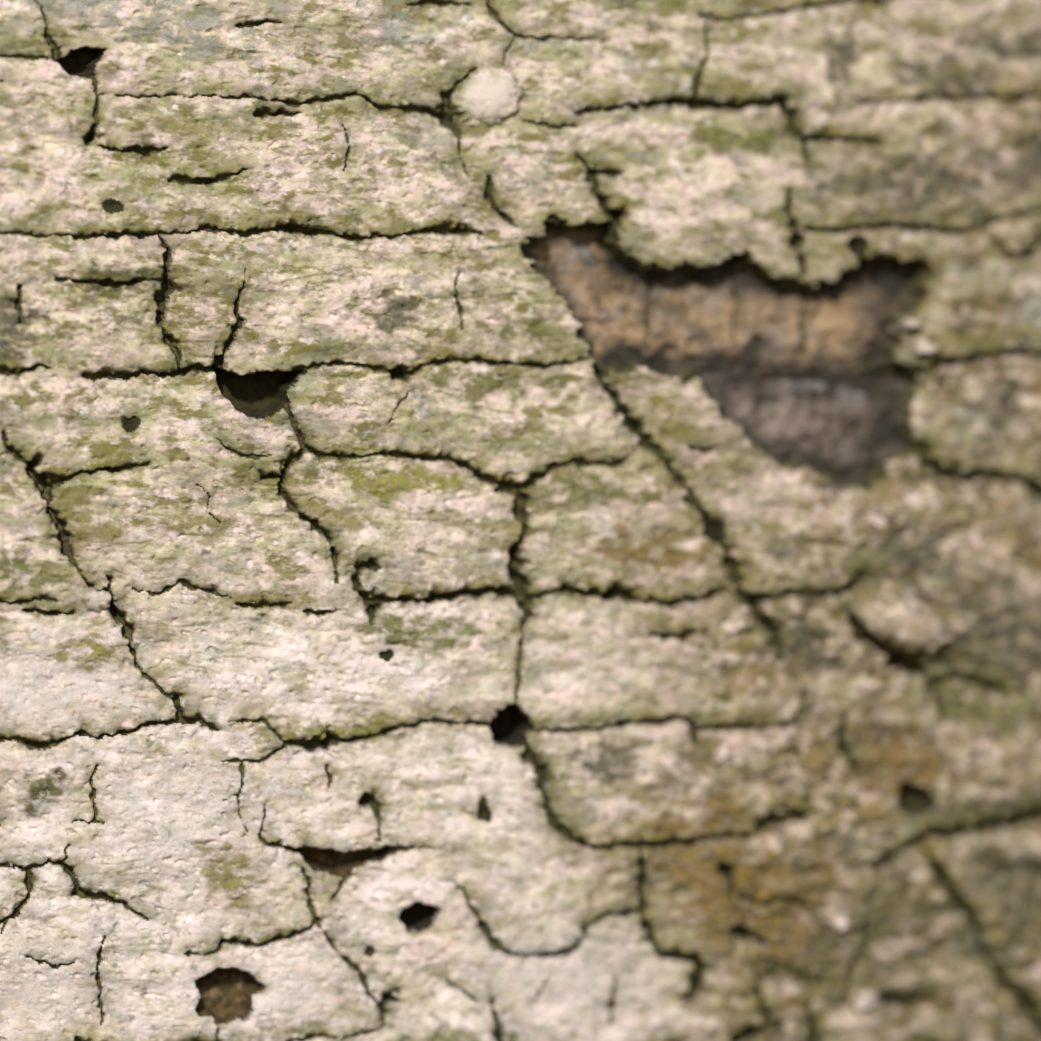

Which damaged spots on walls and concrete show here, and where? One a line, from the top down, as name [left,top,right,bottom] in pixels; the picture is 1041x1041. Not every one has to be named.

crack [0,0,61,83]
crack [235,19,282,28]
crack [0,67,518,382]
crack [407,0,589,66]
spalling [521,214,939,492]
crack [523,0,1041,278]
crack [216,356,1041,723]
crack [0,430,488,1041]
crack [446,979,503,1041]
crack [452,689,826,1003]
crack [730,988,818,1041]
crack [851,809,1041,1041]